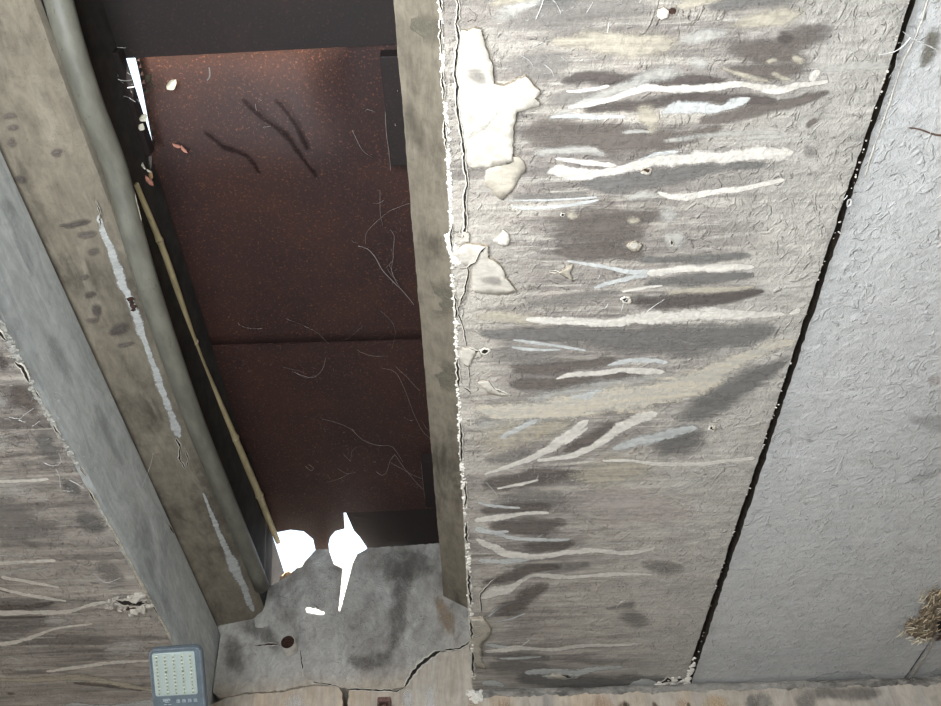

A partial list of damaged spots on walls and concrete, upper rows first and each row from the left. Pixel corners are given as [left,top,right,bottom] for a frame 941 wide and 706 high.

crack [453,0,482,238]
leakage [62,220,98,255]
leakage [434,287,453,314]
crack [457,301,467,346]
flaking render [436,0,540,679]
leakage [474,0,887,626]
leakage [12,387,35,414]
leakage [77,514,103,532]
leakage [0,555,106,646]
leakage [0,642,152,695]
crack [255,641,469,693]
leakage [482,643,665,687]